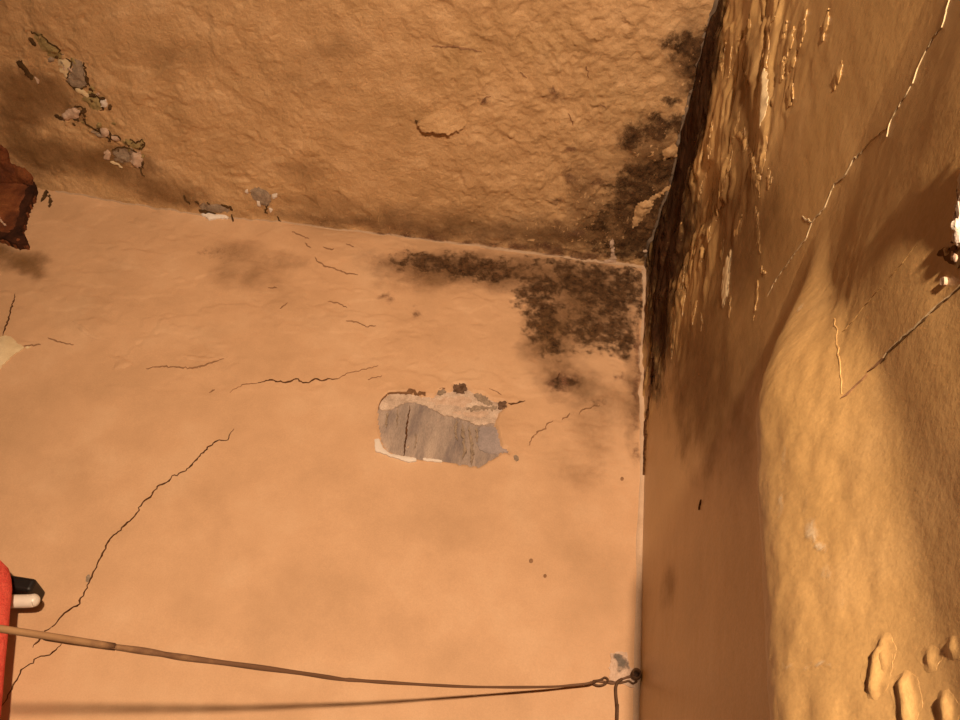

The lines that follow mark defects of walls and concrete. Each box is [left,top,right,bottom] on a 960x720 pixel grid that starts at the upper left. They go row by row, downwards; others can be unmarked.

peeling [23,26,145,177]
peeling [183,195,234,222]
damp [389,0,773,435]
peeling [632,185,671,228]
peeling [662,143,678,161]
peeling [700,9,808,318]
crack [767,0,950,296]
crack [146,358,224,369]
crack [209,366,381,393]
spalling [374,383,524,468]
crack [833,244,960,398]
crack [2,429,234,705]